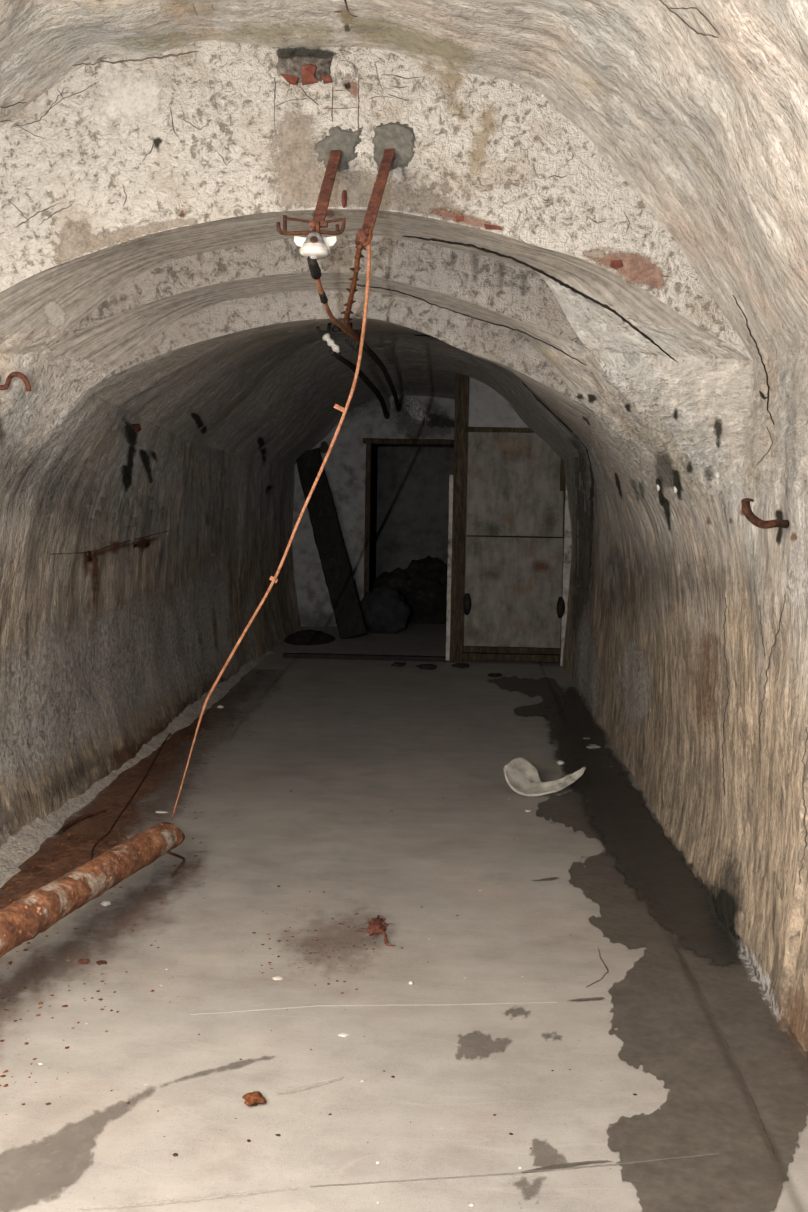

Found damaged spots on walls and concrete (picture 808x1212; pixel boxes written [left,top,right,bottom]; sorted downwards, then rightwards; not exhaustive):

crack [334,0,358,32]
crack [0,51,199,139]
spalling [276,47,357,96]
crack [403,236,678,363]
crack [732,295,774,465]
corrosion [84,539,155,606]
leakage [489,442,808,1212]
leakage [456,1031,511,1059]
leakage [0,1056,270,1212]